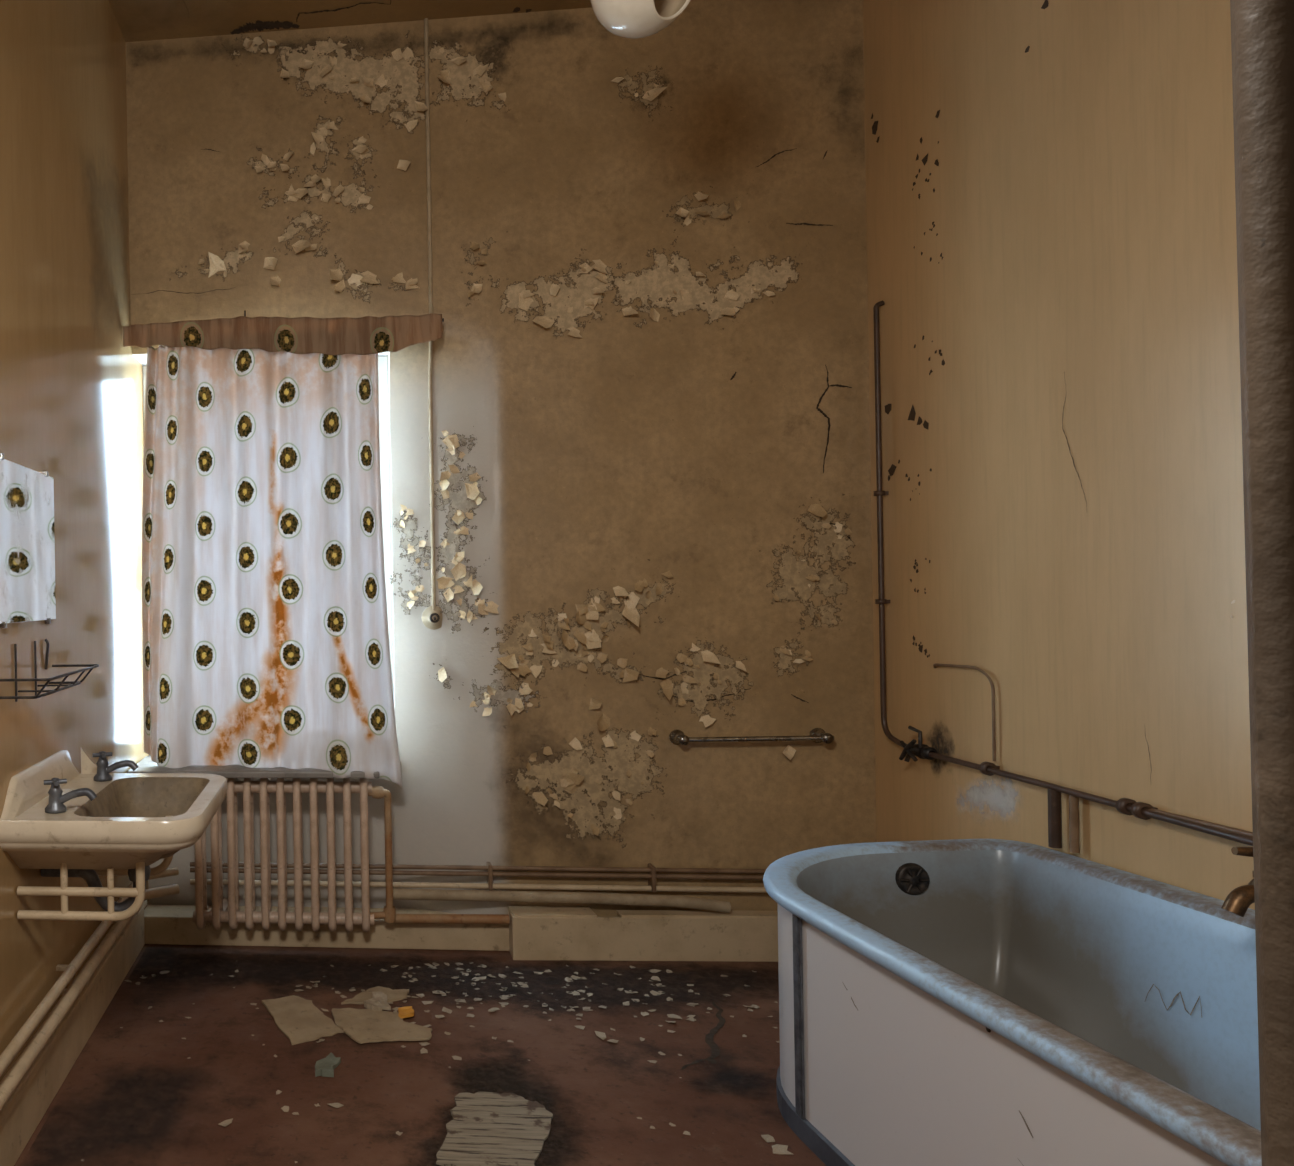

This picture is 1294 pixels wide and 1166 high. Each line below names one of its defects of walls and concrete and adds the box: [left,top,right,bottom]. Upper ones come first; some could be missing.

crack [230,0,391,34]
peeling [169,30,511,303]
peeling [459,186,802,339]
peeling [389,426,753,728]
peeling [506,698,667,856]